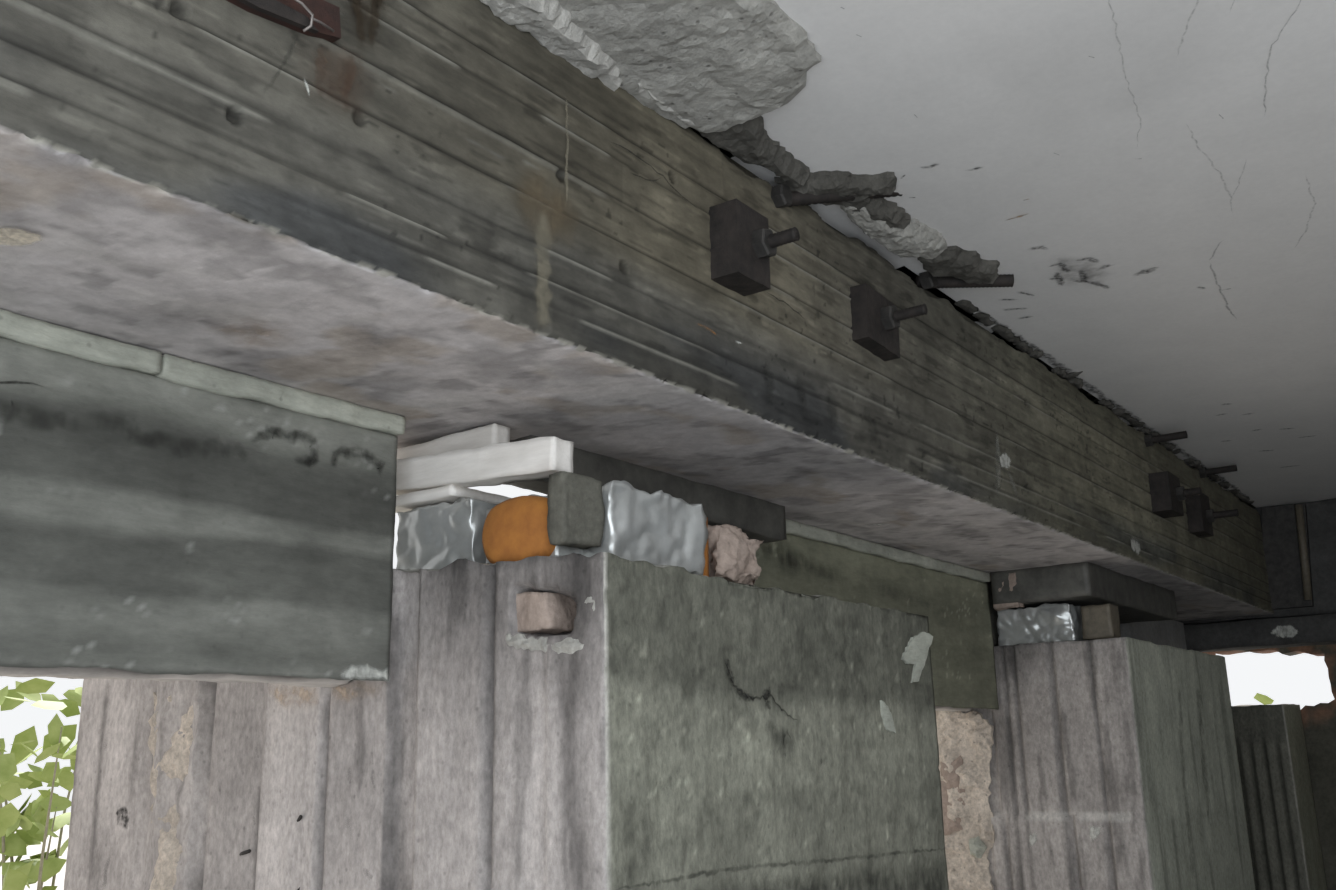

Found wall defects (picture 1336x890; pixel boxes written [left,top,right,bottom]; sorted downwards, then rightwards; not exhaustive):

spalling [480,0,1000,284]
peeling [954,300,1083,389]